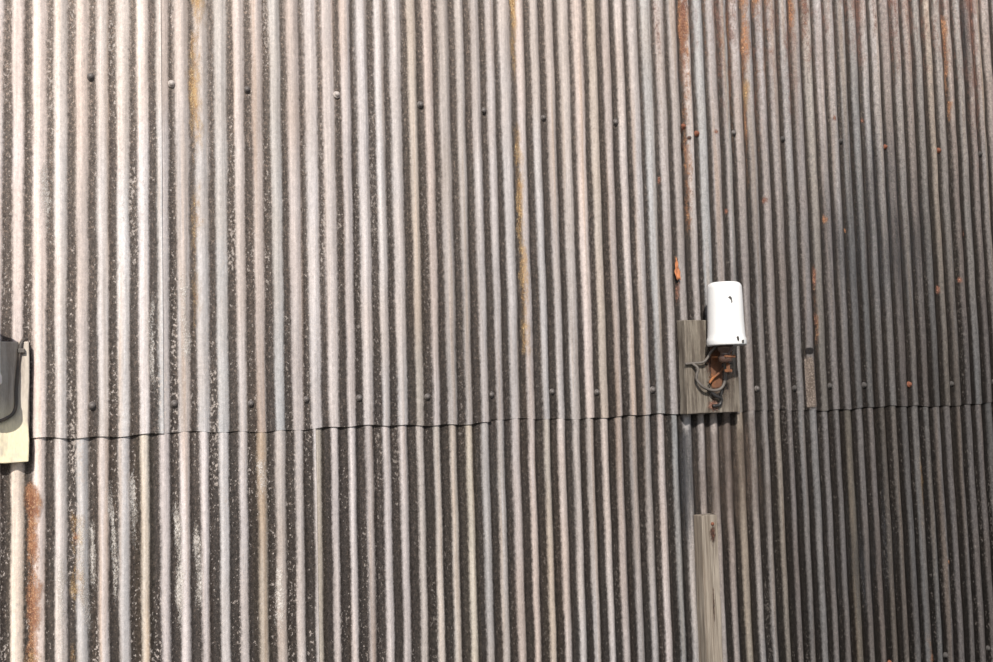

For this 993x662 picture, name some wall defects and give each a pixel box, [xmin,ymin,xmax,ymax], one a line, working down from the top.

rust [677,0,689,98]
rust [739,0,766,73]
rust [25,484,42,662]